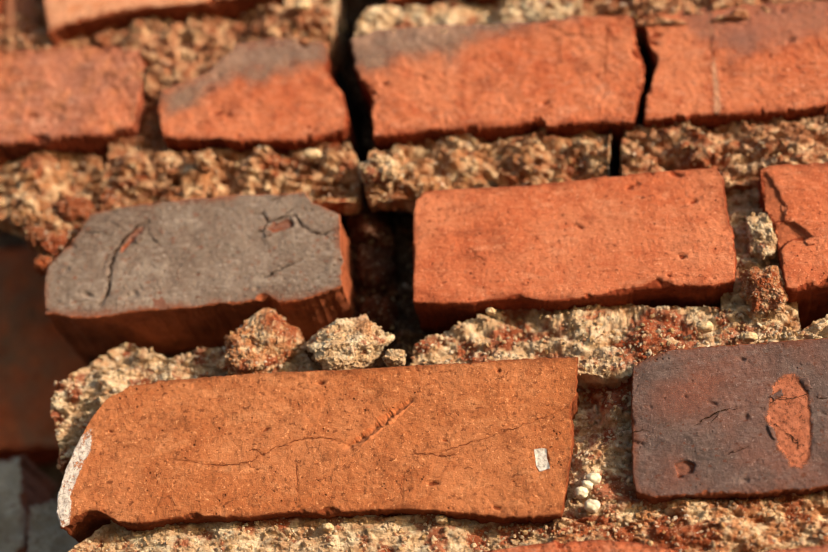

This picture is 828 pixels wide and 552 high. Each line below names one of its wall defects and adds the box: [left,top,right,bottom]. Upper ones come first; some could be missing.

crack [347,17,355,39]
crack [334,71,379,166]
crack [607,31,651,177]
crack [85,223,161,304]
crack [256,195,334,239]
crack [400,407,570,500]
spalling [765,373,812,468]
peeling [57,492,70,520]